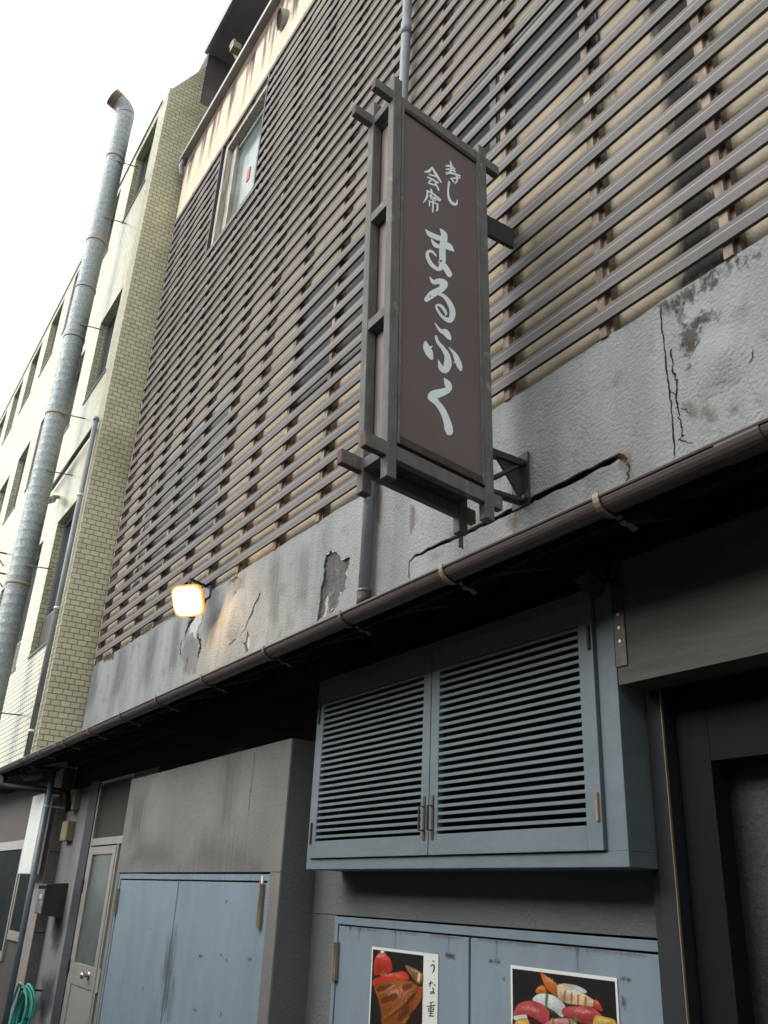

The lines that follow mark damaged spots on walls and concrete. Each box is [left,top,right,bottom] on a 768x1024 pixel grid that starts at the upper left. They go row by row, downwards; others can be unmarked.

leakage [649,0,697,107]
leakage [667,102,700,134]
leakage [671,125,706,163]
leakage [673,155,710,194]
leakage [676,190,710,226]
leakage [680,220,716,253]
leakage [658,247,761,368]
crack [660,305,691,457]
crack [415,454,630,557]
flaking render [317,551,350,619]
peeling [180,615,202,672]